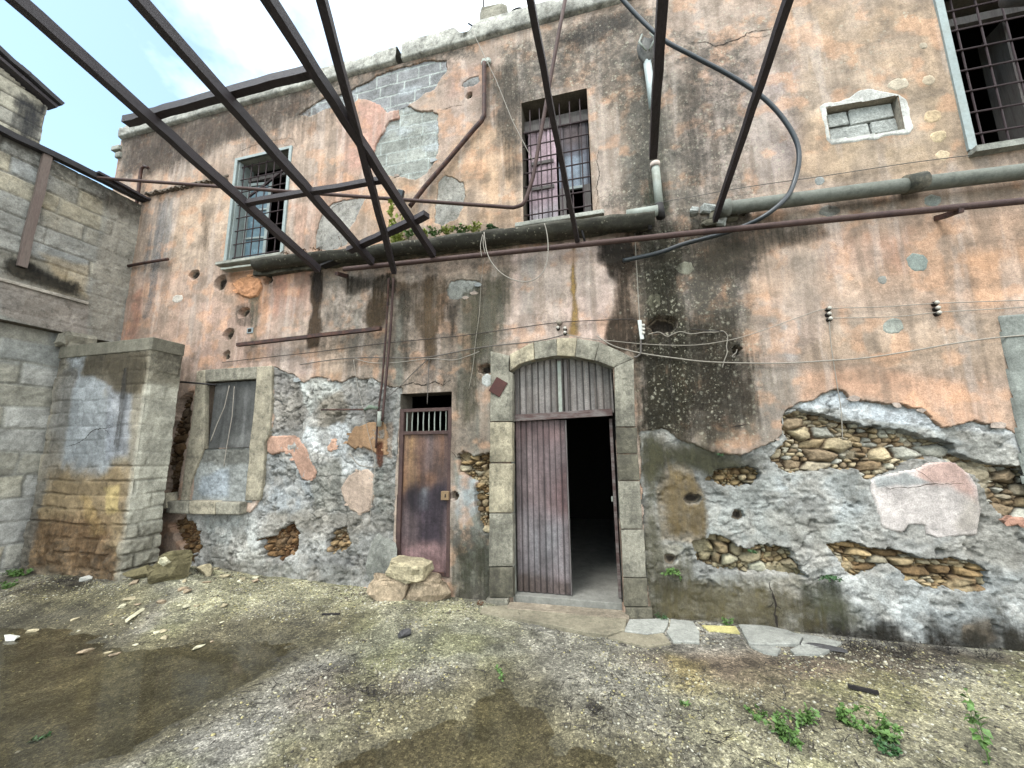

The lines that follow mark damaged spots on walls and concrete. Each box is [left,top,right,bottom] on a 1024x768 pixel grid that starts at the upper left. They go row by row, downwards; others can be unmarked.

flaking render [301,61,447,180]
leakage [5,258,79,293]
leakage [307,270,323,348]
flaking render [316,198,365,250]
leakage [345,274,509,419]
flaking render [435,176,465,226]
leakage [598,215,823,535]
flaking render [176,367,402,588]
flaking render [460,452,491,533]
flaking render [639,389,1024,648]